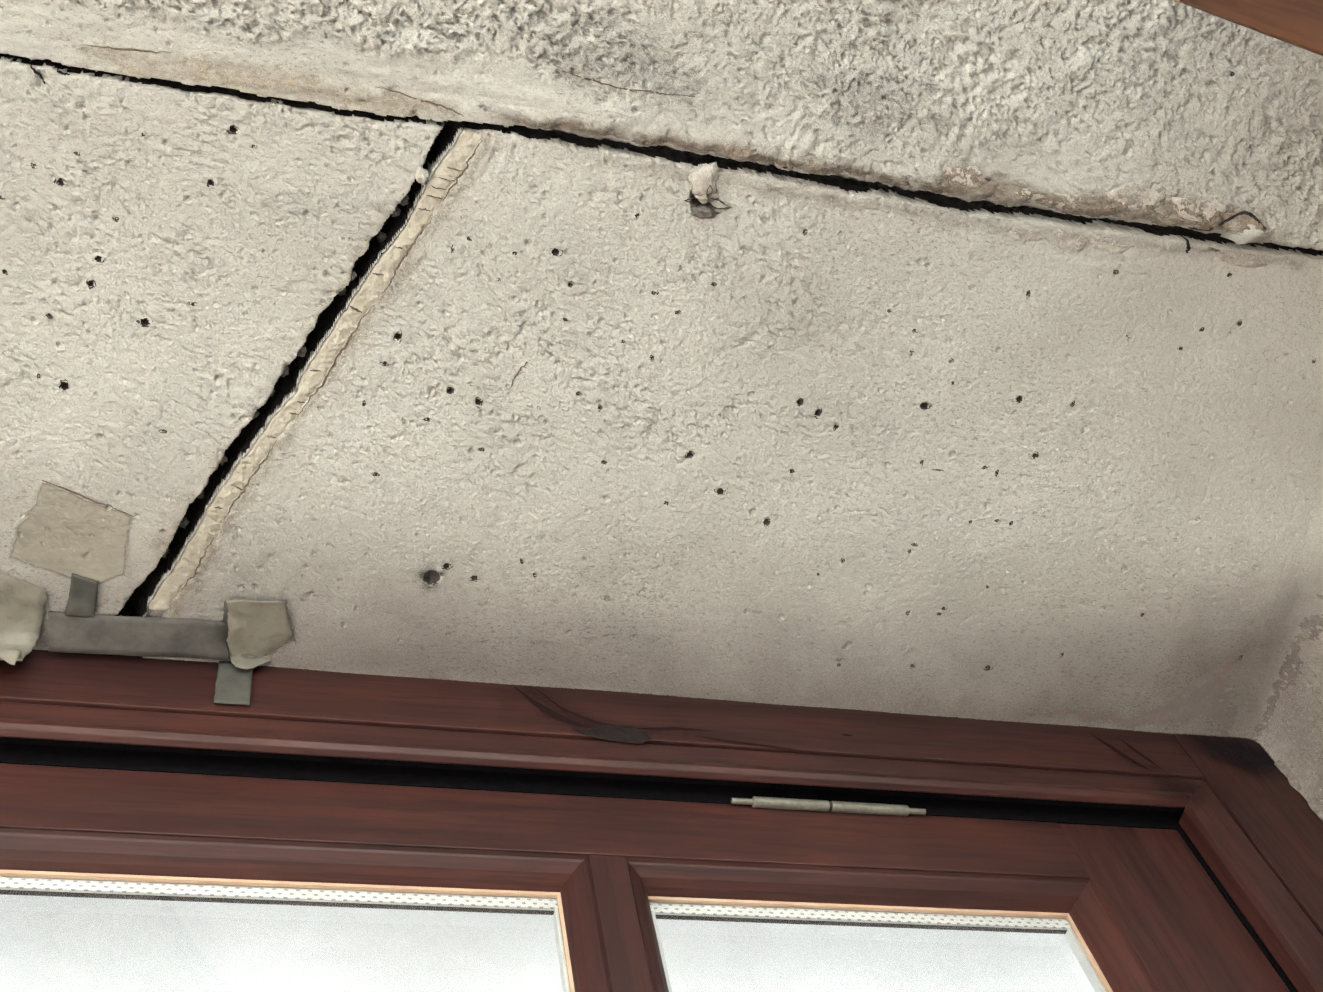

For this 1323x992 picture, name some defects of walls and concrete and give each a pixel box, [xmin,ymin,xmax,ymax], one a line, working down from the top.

crack [0,45,1323,617]